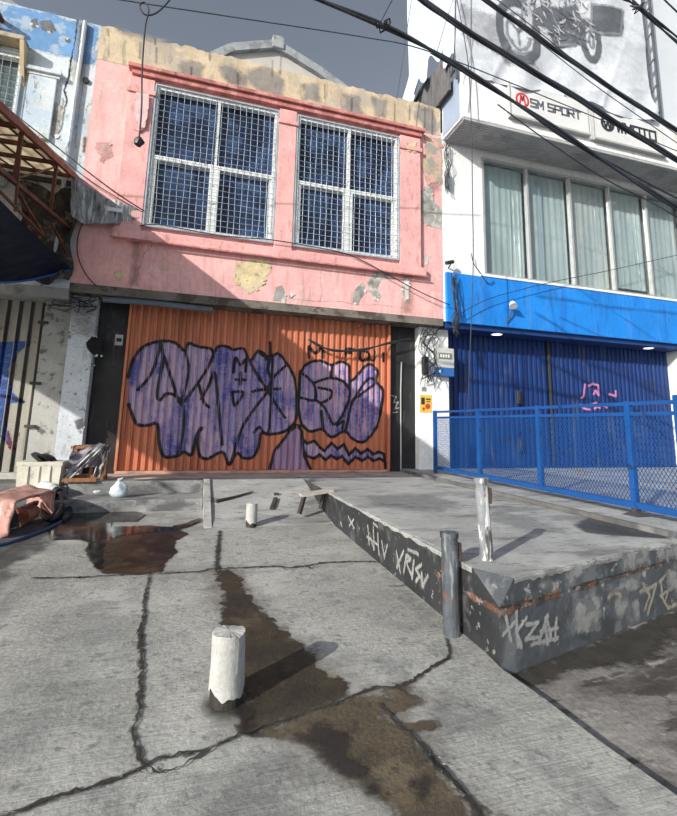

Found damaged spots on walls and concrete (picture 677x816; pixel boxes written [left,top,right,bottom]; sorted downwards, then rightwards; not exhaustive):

peeling [30,18,56,34]
damp [221,66,283,95]
damp [303,84,319,101]
damp [344,95,362,114]
damp [372,97,386,116]
peeling [406,134,444,229]
peeling [232,258,271,294]
peeling [273,286,296,304]
peeling [353,272,393,305]
peeling [401,279,411,302]
crack [0,530,480,816]
damp [205,569,502,816]